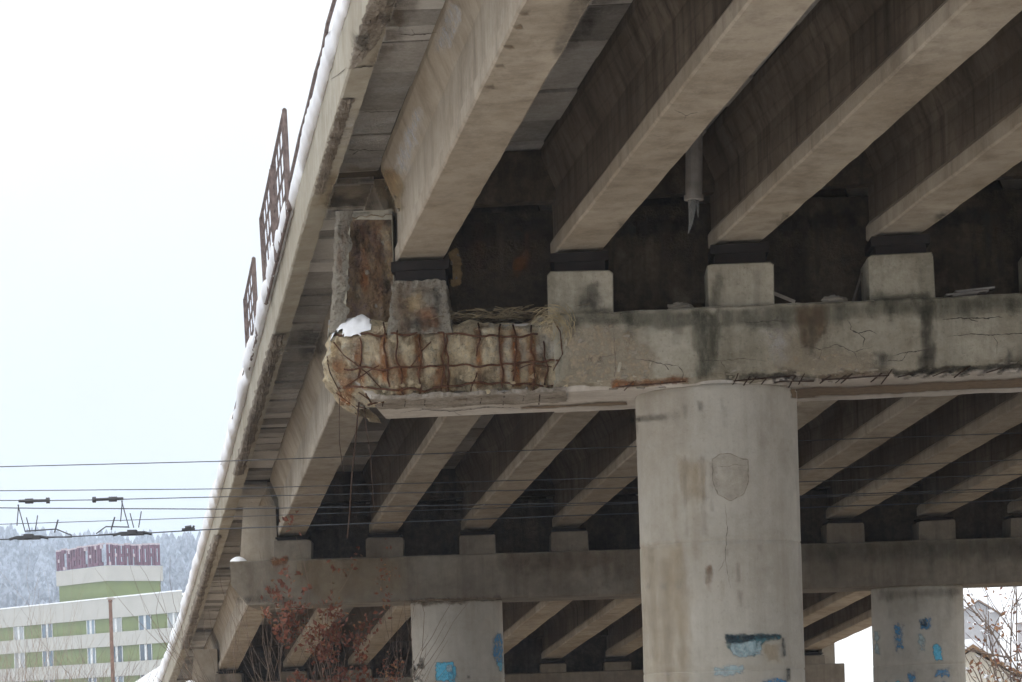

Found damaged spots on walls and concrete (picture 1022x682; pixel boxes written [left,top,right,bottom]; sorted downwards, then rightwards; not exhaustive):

spalling [350,0,396,69]
spalling [322,211,687,423]
crack [889,316,1022,361]
spalling [726,361,1022,399]